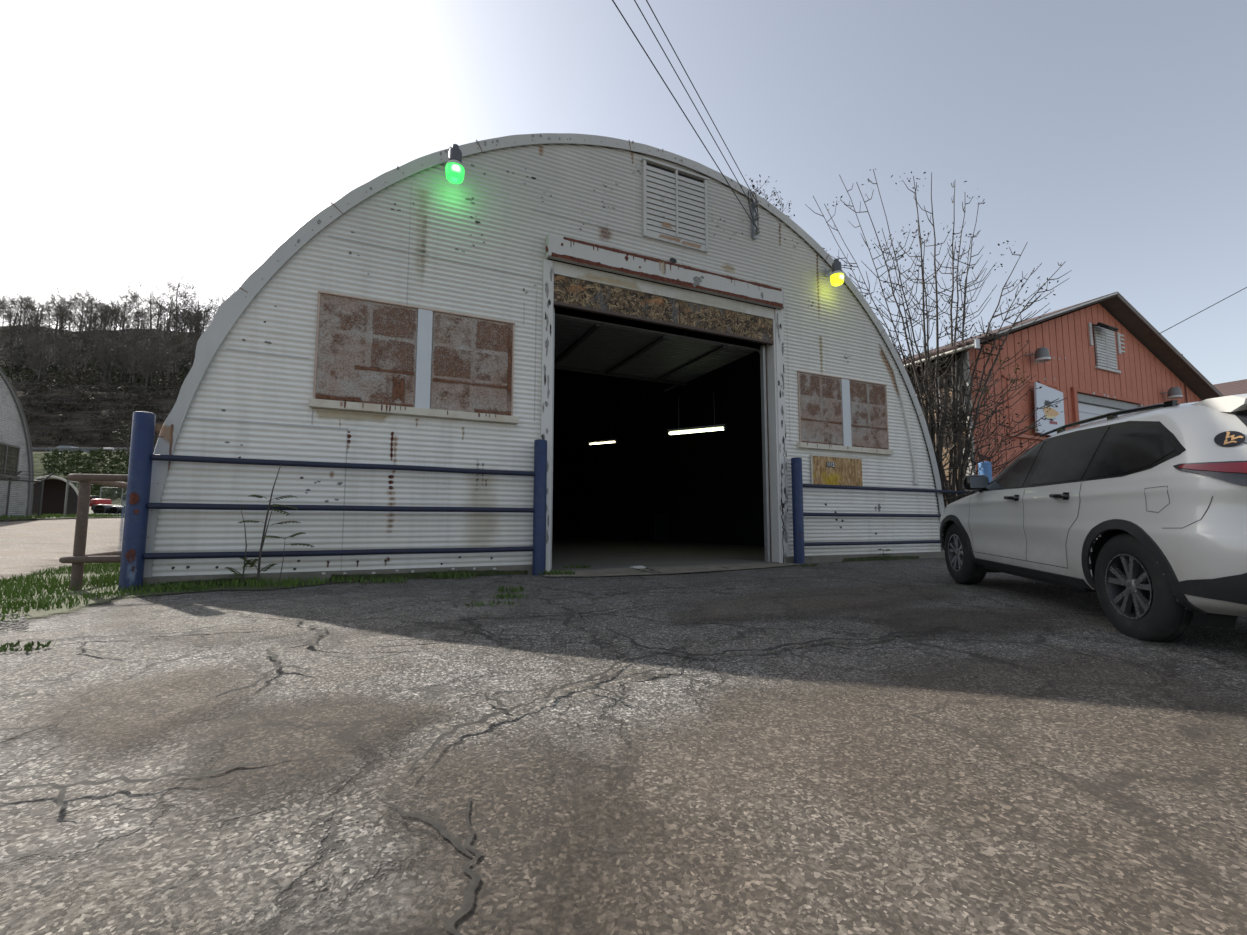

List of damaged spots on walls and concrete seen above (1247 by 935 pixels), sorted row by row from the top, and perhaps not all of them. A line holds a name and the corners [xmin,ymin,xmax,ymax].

corrosion [316,304,418,448]
corrosion [433,315,512,417]
corrosion [388,432,397,527]
crack [779,414,787,553]
crack [19,590,997,773]
crack [0,756,296,807]